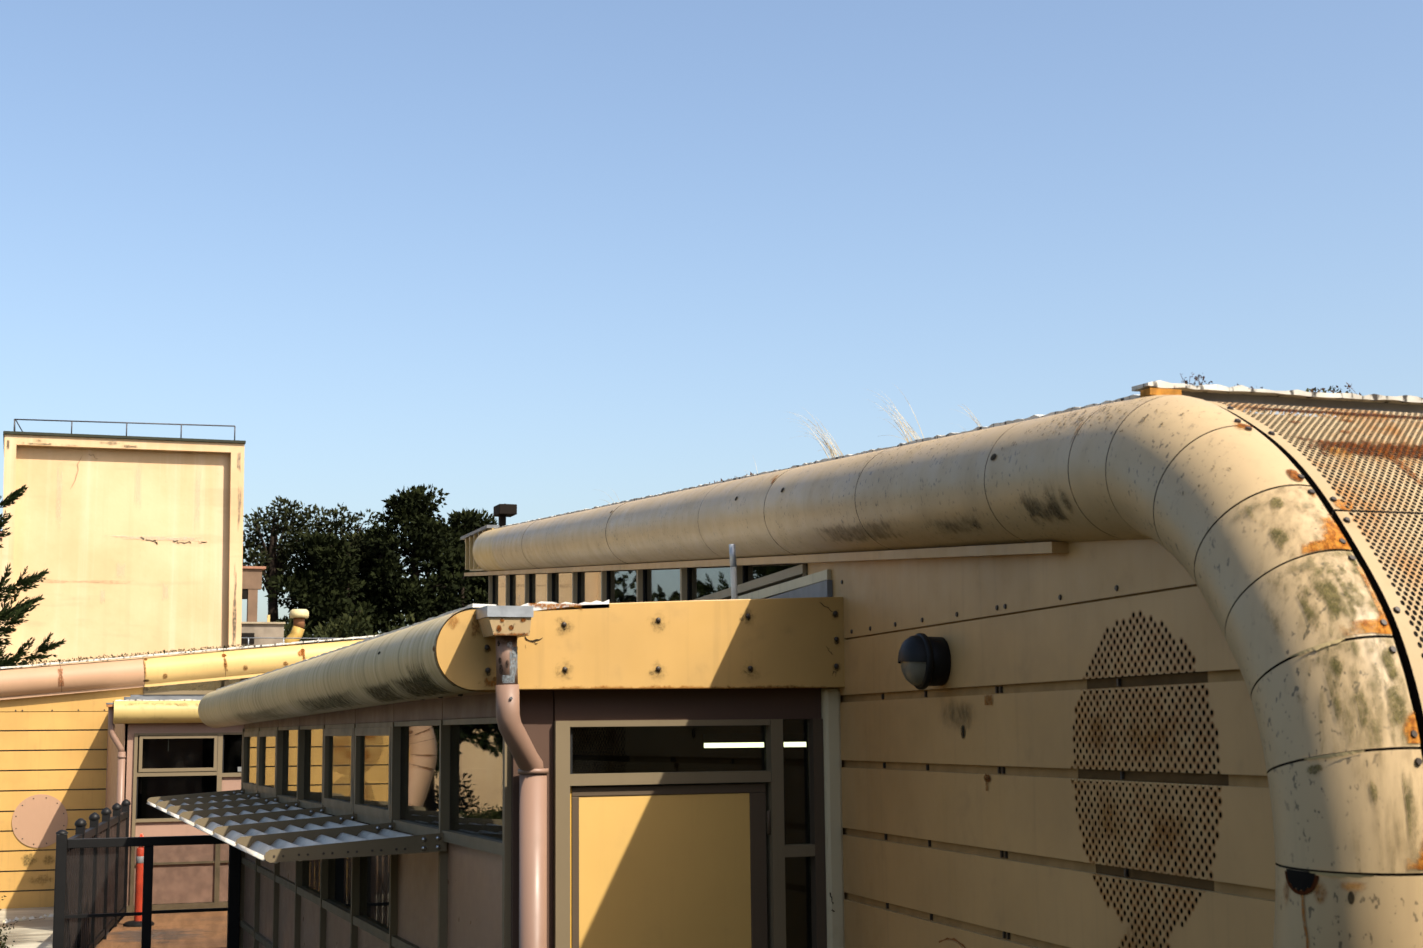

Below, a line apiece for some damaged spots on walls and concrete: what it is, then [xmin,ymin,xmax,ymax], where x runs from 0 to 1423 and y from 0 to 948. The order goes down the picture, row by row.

rust [1238,407,1423,484]
rust [1303,499,1353,554]
rust [1356,567,1392,634]
damp [1298,551,1409,741]
rust [1404,713,1420,743]
damp [1398,780,1414,844]
rust [1285,871,1323,948]